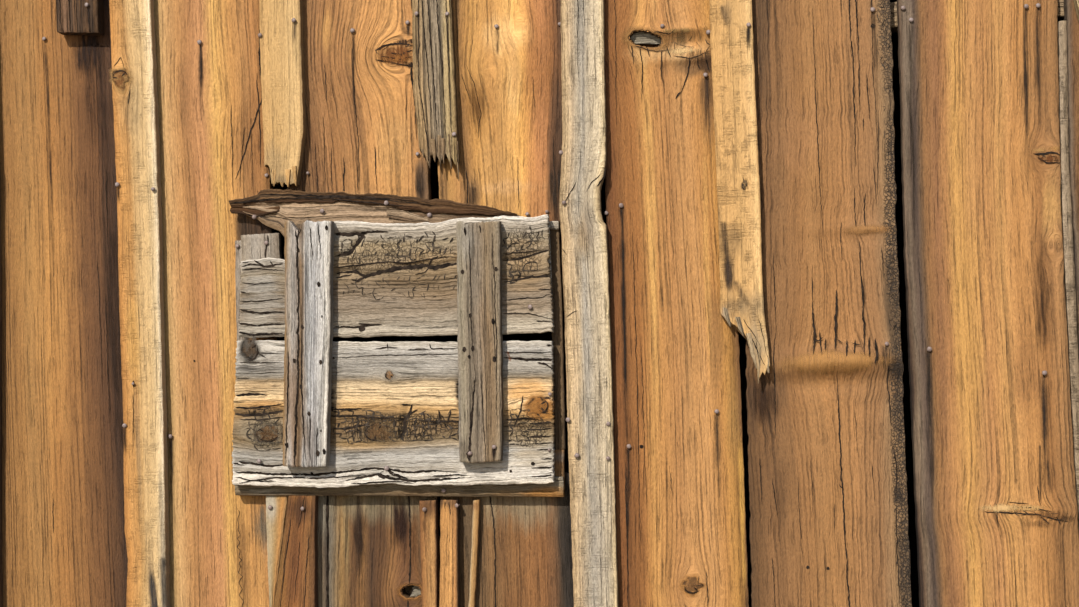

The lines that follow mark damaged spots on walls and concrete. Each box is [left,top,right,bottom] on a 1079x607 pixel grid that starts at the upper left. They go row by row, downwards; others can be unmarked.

crack [231,30,576,607]